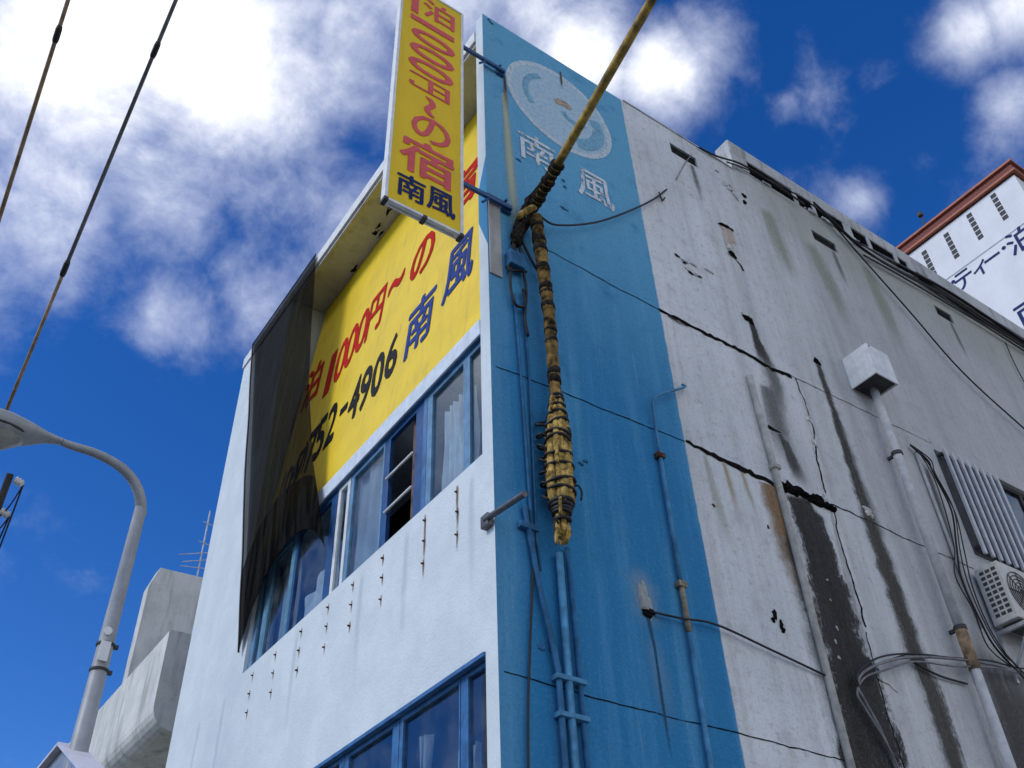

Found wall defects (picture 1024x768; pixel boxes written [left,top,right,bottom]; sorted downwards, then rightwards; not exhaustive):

peeling [675,253,714,278]
flaking render [718,222,744,271]
water stain [741,312,800,470]
crack [496,250,975,768]
corrosion [761,483,796,577]
water stain [787,496,908,768]
water stain [813,357,965,768]
water stain [982,668,1024,768]